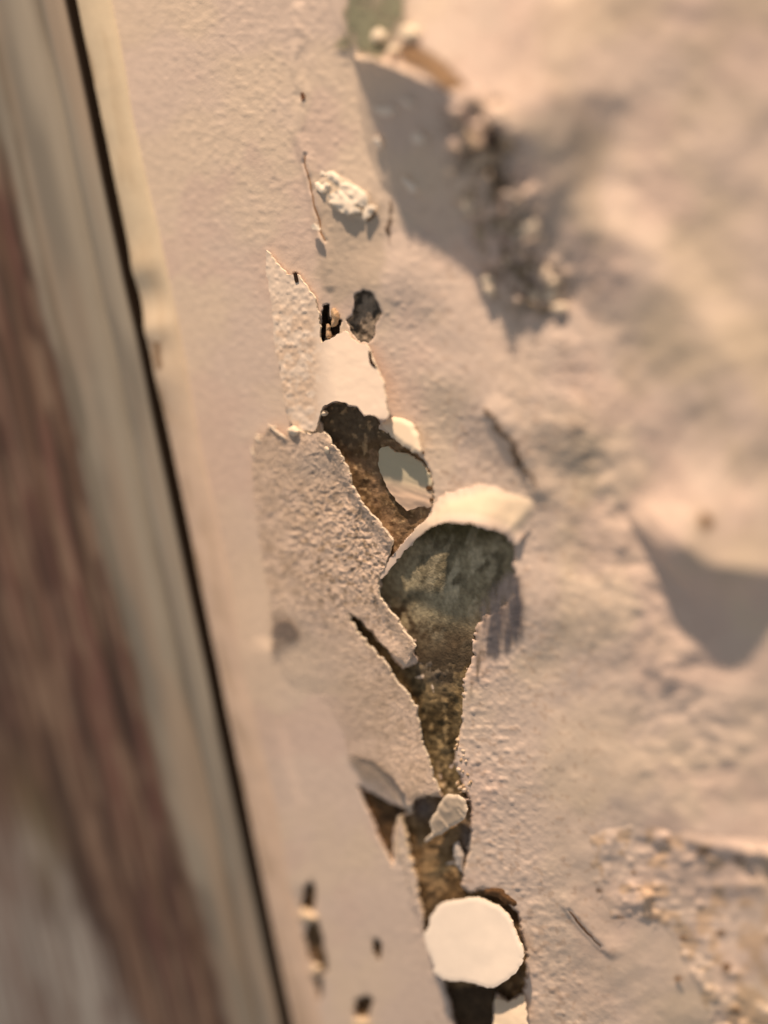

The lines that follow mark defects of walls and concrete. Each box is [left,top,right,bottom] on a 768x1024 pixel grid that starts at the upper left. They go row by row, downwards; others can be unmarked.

crack [304,156,326,241]
peeling [251,250,528,1024]